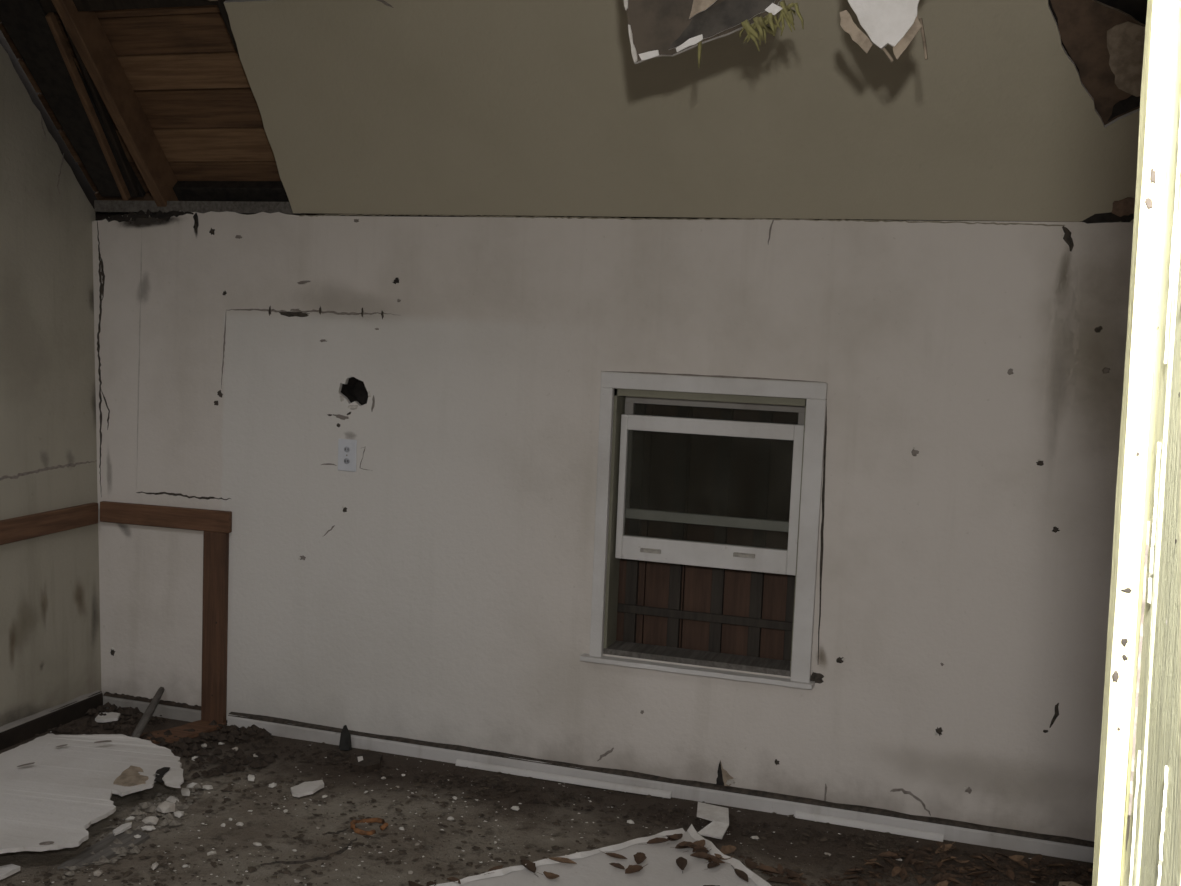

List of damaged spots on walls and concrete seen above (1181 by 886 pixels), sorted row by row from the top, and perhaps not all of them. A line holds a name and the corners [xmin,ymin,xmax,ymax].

spalling [327,377,368,427]